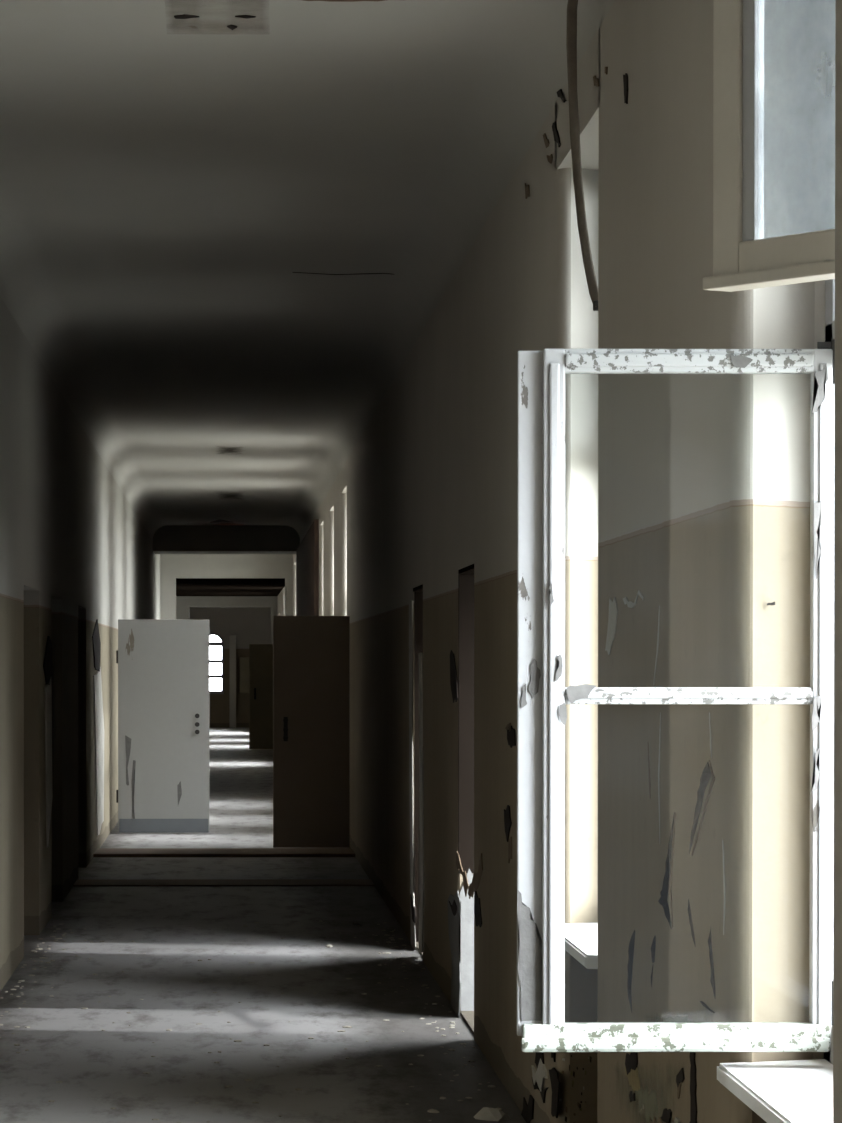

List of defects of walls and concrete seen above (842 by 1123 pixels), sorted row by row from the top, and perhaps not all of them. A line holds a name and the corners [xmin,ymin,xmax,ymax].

peeling [543,121,561,164]
peeling [521,1052,592,1123]
flaking render [625,1052,641,1102]
flaking render [649,1068,685,1123]